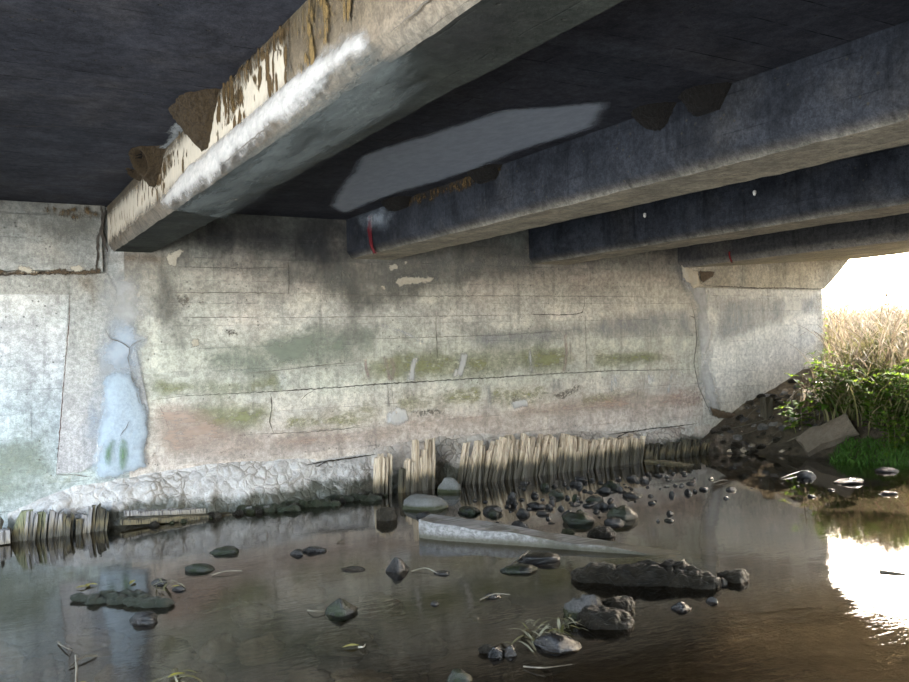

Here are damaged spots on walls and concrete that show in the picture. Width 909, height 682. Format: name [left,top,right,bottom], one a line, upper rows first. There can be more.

peeling [158,123,183,149]
damp [107,41,287,244]
crack [0,269,70,277]
spalling [388,261,434,287]
damp [104,326,137,369]
damp [216,334,346,373]
damp [454,354,467,377]
crack [56,298,88,477]